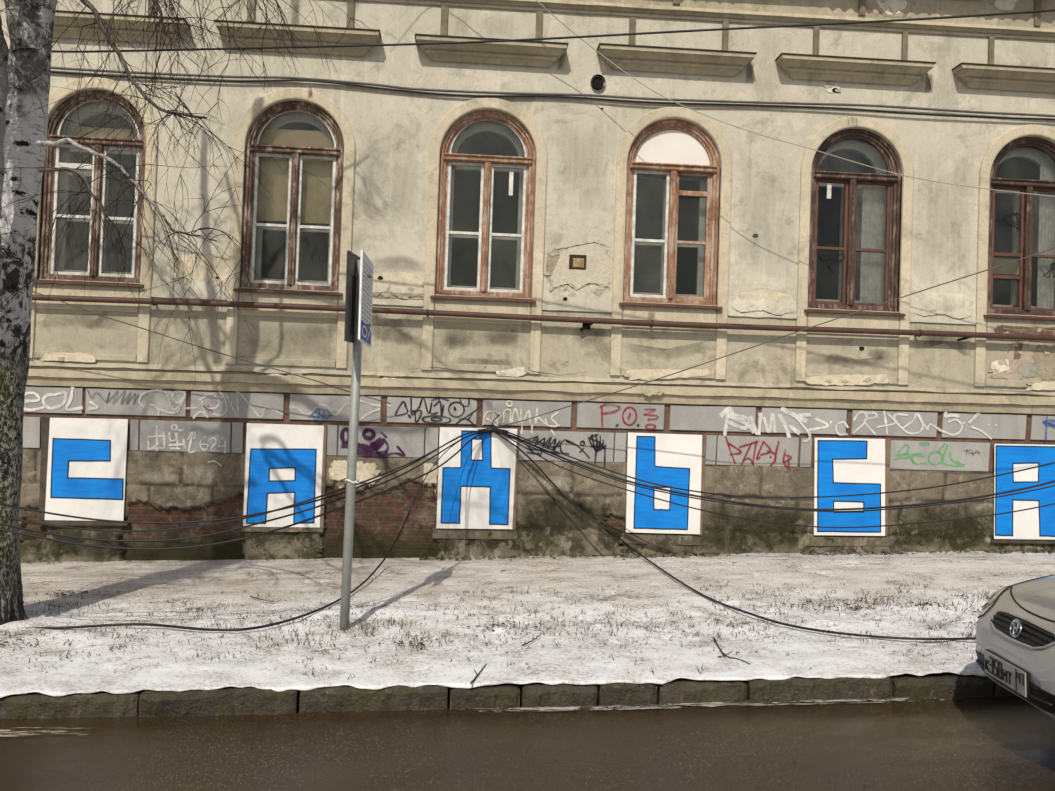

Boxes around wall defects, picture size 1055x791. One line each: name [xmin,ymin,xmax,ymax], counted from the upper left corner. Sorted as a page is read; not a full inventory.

flaking render [866,0,915,19]
crack [546,242,611,293]
spalling [988,325,1055,391]
spalling [118,493,245,561]
spalling [320,460,441,559]